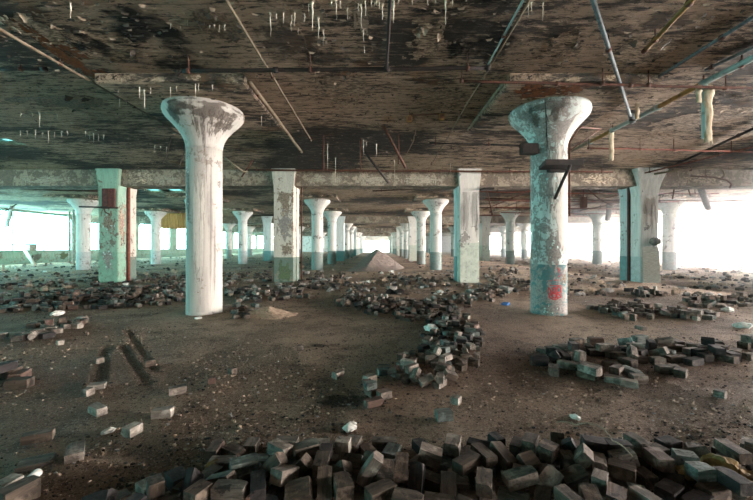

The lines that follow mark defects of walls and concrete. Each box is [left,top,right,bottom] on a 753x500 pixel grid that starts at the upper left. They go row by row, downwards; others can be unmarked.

damp [68,33,112,57]
damp [104,7,234,70]
damp [447,17,517,64]
corrosion [508,84,590,100]
peeling [501,171,558,213]
peeling [99,197,126,253]
peeling [276,189,293,256]
peeling [533,215,566,284]